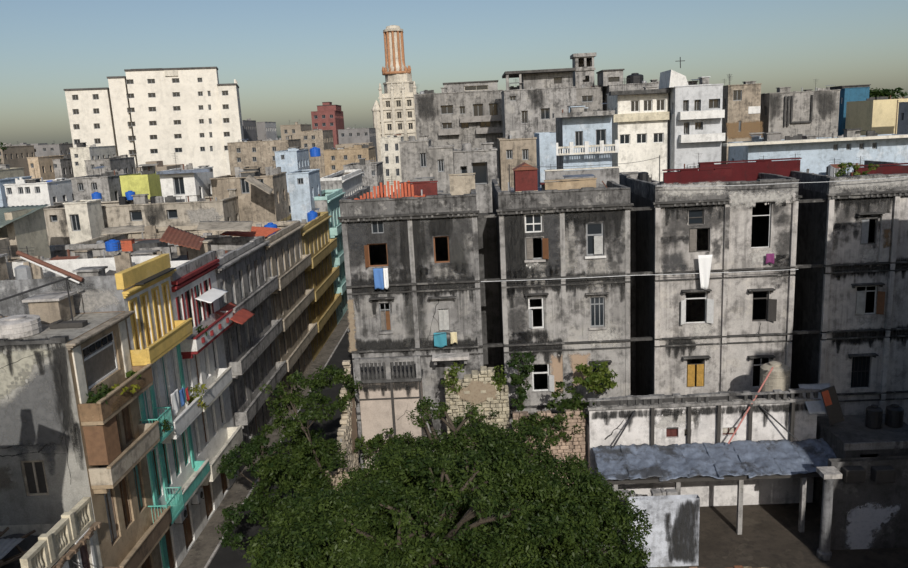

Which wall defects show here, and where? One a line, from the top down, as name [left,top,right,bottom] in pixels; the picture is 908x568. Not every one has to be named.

leakage [0,337,83,472]
crack [0,418,71,484]
peeling [846,503,899,550]